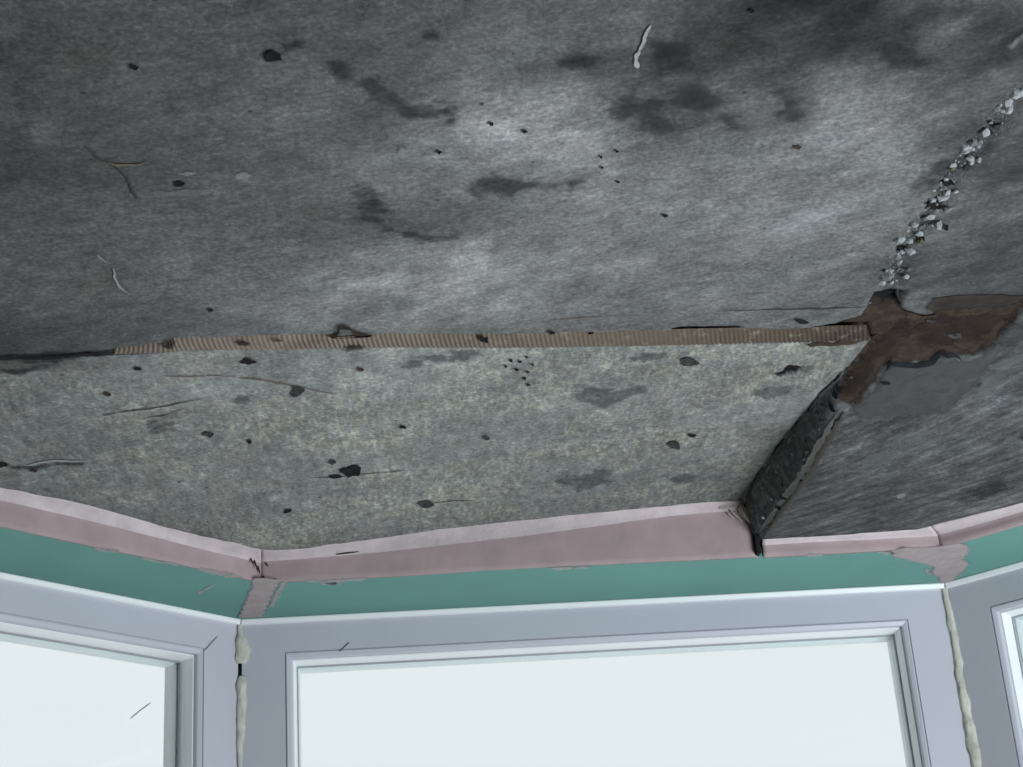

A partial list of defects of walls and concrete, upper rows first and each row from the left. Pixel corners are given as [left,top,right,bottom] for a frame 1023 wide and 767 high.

damp [634,25,651,68]
corrosion [808,293,1023,404]